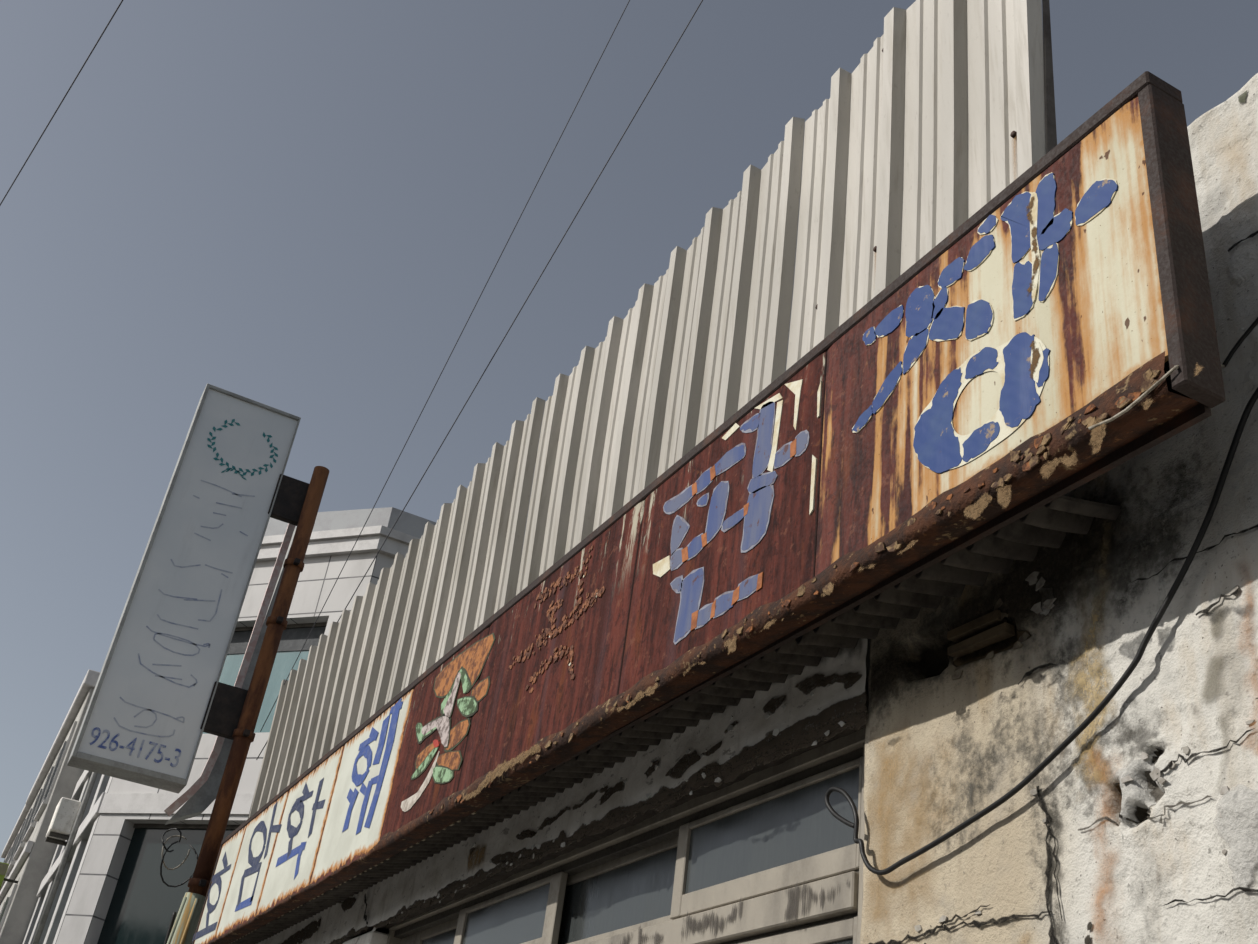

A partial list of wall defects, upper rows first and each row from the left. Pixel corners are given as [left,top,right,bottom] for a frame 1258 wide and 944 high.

crack [1131,524,1258,583]
spalling [1025,571,1057,616]
crack [1196,585,1240,616]
spalling [1074,600,1167,826]
crack [1157,720,1255,774]
peeling [331,672,868,944]
crack [869,786,1212,944]
crack [1162,887,1258,906]
peeling [281,918,321,944]